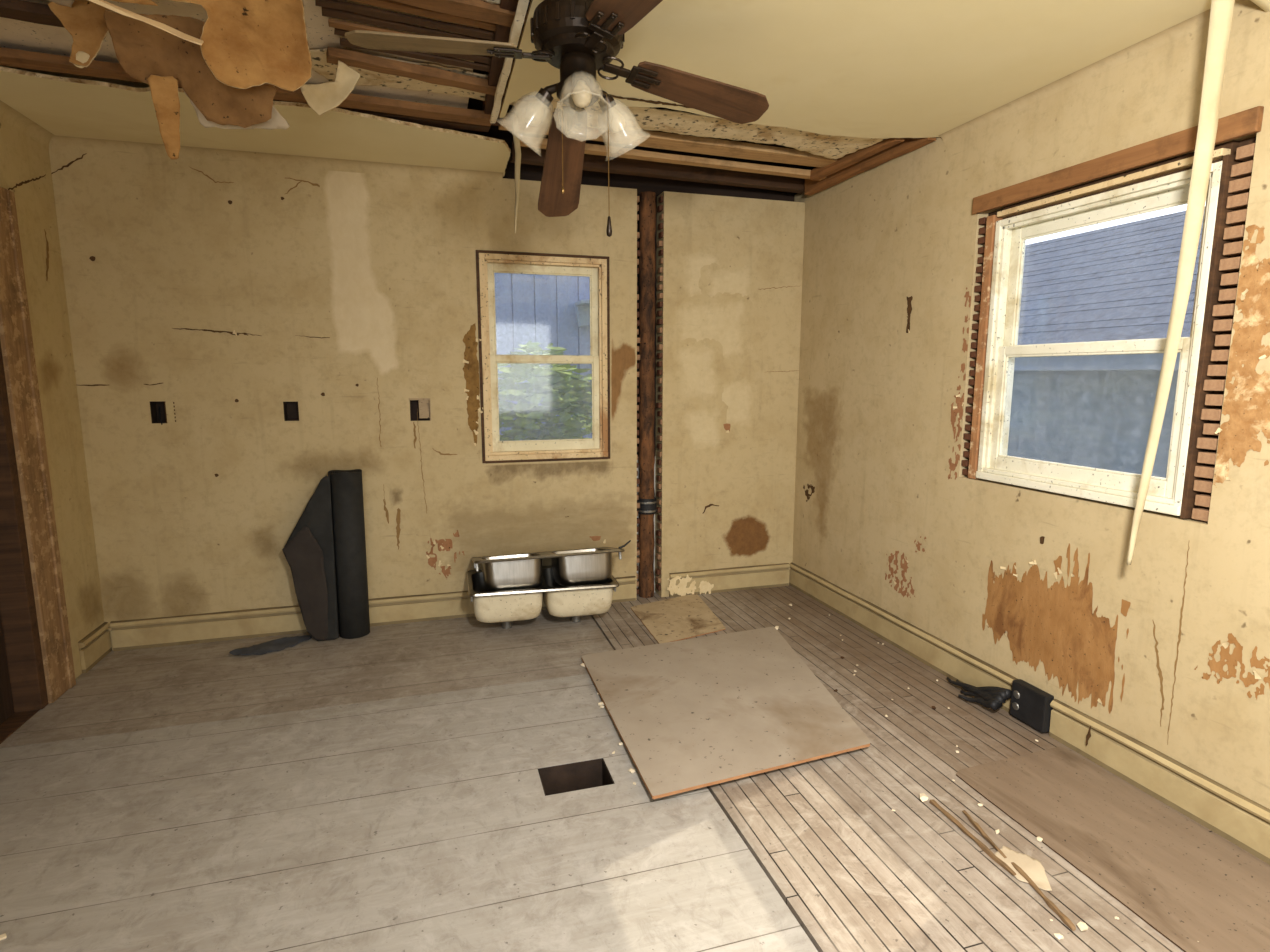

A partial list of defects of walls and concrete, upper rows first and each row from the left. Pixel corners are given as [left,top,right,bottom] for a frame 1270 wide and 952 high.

crack [173,328,261,336]
spalling [463,324,483,446]
spalling [1213,225,1270,486]
peeling [426,530,465,578]
peeling [885,536,926,598]
peeling [982,543,1131,714]
peeling [1194,633,1270,699]